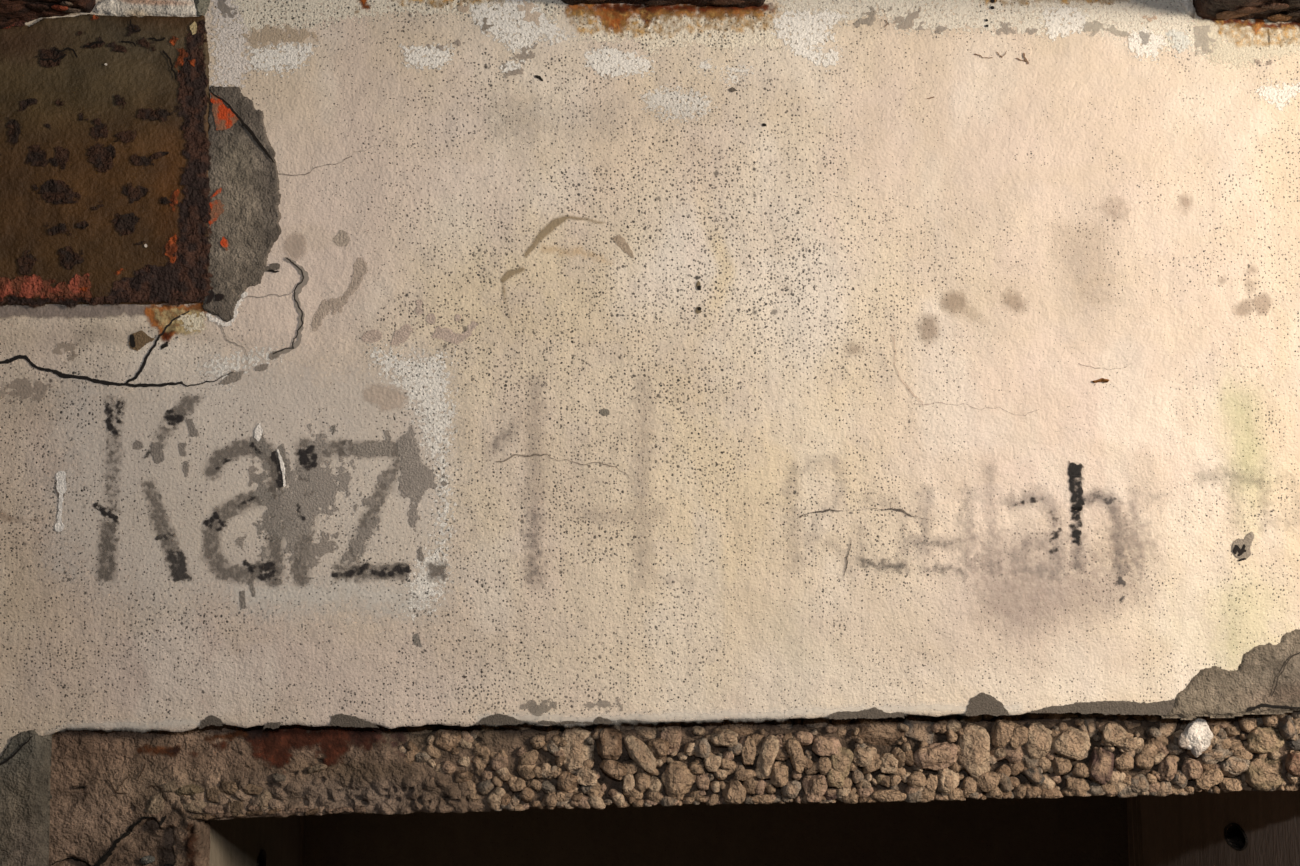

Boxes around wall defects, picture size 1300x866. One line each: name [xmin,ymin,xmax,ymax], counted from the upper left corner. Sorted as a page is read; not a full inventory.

rust [567,0,769,35]
rust [1202,3,1300,44]
rust [0,19,213,341]
flaking render [190,0,1300,327]
crack [0,257,309,387]
flaking render [0,730,52,866]
crack [52,764,166,866]
rust [137,745,197,756]
spalling [145,773,366,820]
rust [206,724,407,768]
flaking render [330,713,379,728]
spalling [398,629,1300,811]